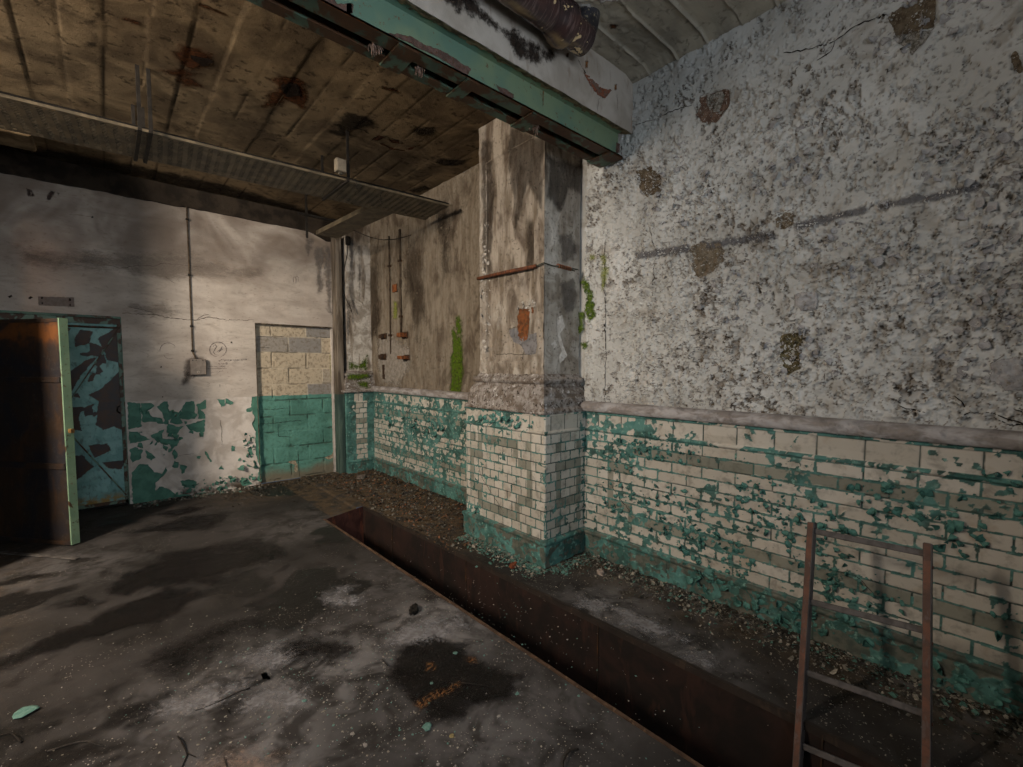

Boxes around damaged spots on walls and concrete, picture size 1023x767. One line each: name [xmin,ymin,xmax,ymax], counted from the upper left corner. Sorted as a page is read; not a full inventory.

spalling [868,0,989,57]
spalling [695,89,730,124]
spalling [636,140,715,232]
spalling [690,242,771,324]
peeling [127,396,262,504]
peeling [601,432,905,648]
peeling [846,479,1001,559]
peeling [981,469,1023,521]
spalling [324,506,900,767]